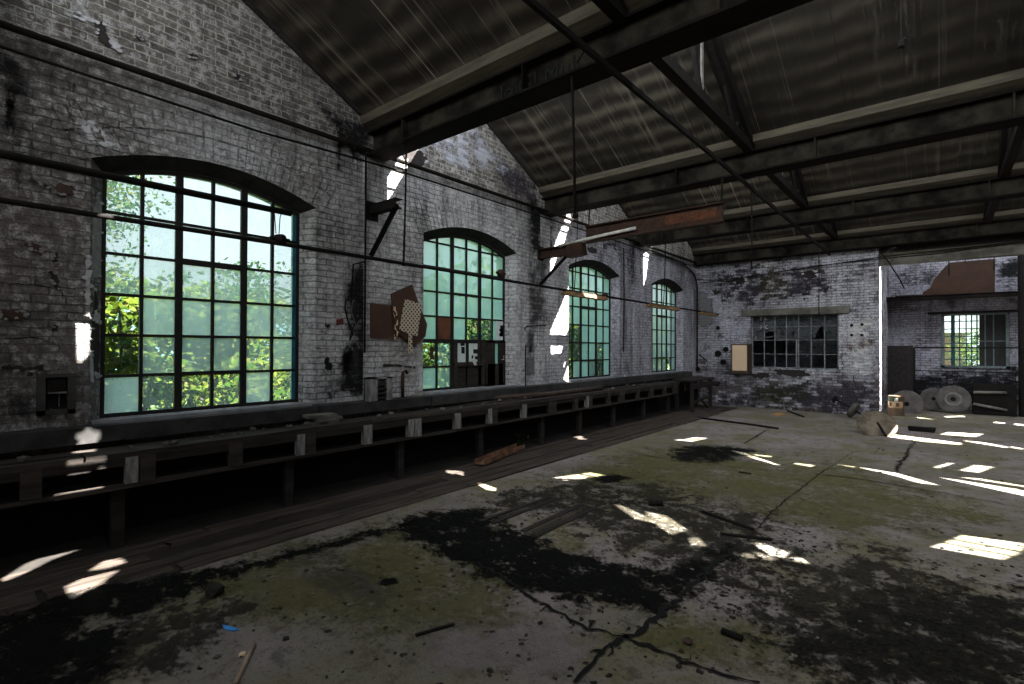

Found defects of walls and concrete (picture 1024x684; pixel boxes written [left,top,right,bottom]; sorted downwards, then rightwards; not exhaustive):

rust [665,207,717,225]
peeling [712,260,768,310]
peeling [780,259,842,305]
crack [477,437,1023,683]